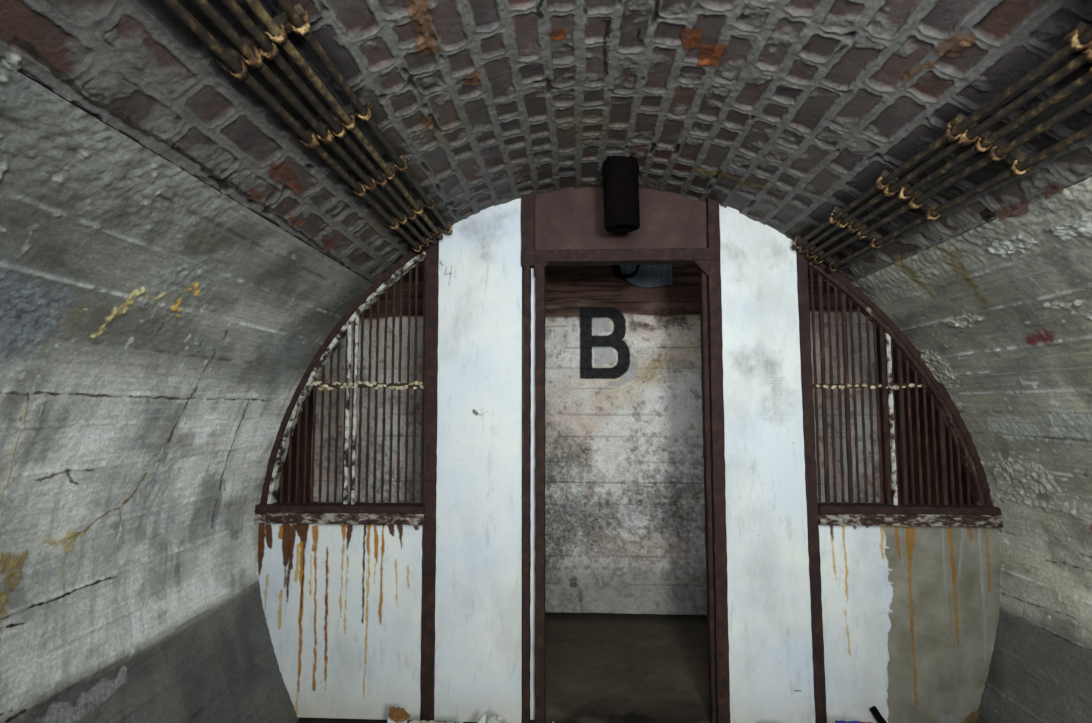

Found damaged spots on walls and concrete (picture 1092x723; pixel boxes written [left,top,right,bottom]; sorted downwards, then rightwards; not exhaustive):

peeling [0,54,21,83]
flaking render [980,201,1029,222]
flaking render [1045,181,1063,199]
crack [0,331,266,529]
crack [67,472,147,541]
crack [0,576,117,628]
corrosion [258,523,346,691]
corrosion [341,525,418,664]
corrosion [830,525,883,594]
corrosion [896,526,915,654]
corrosion [948,527,958,636]